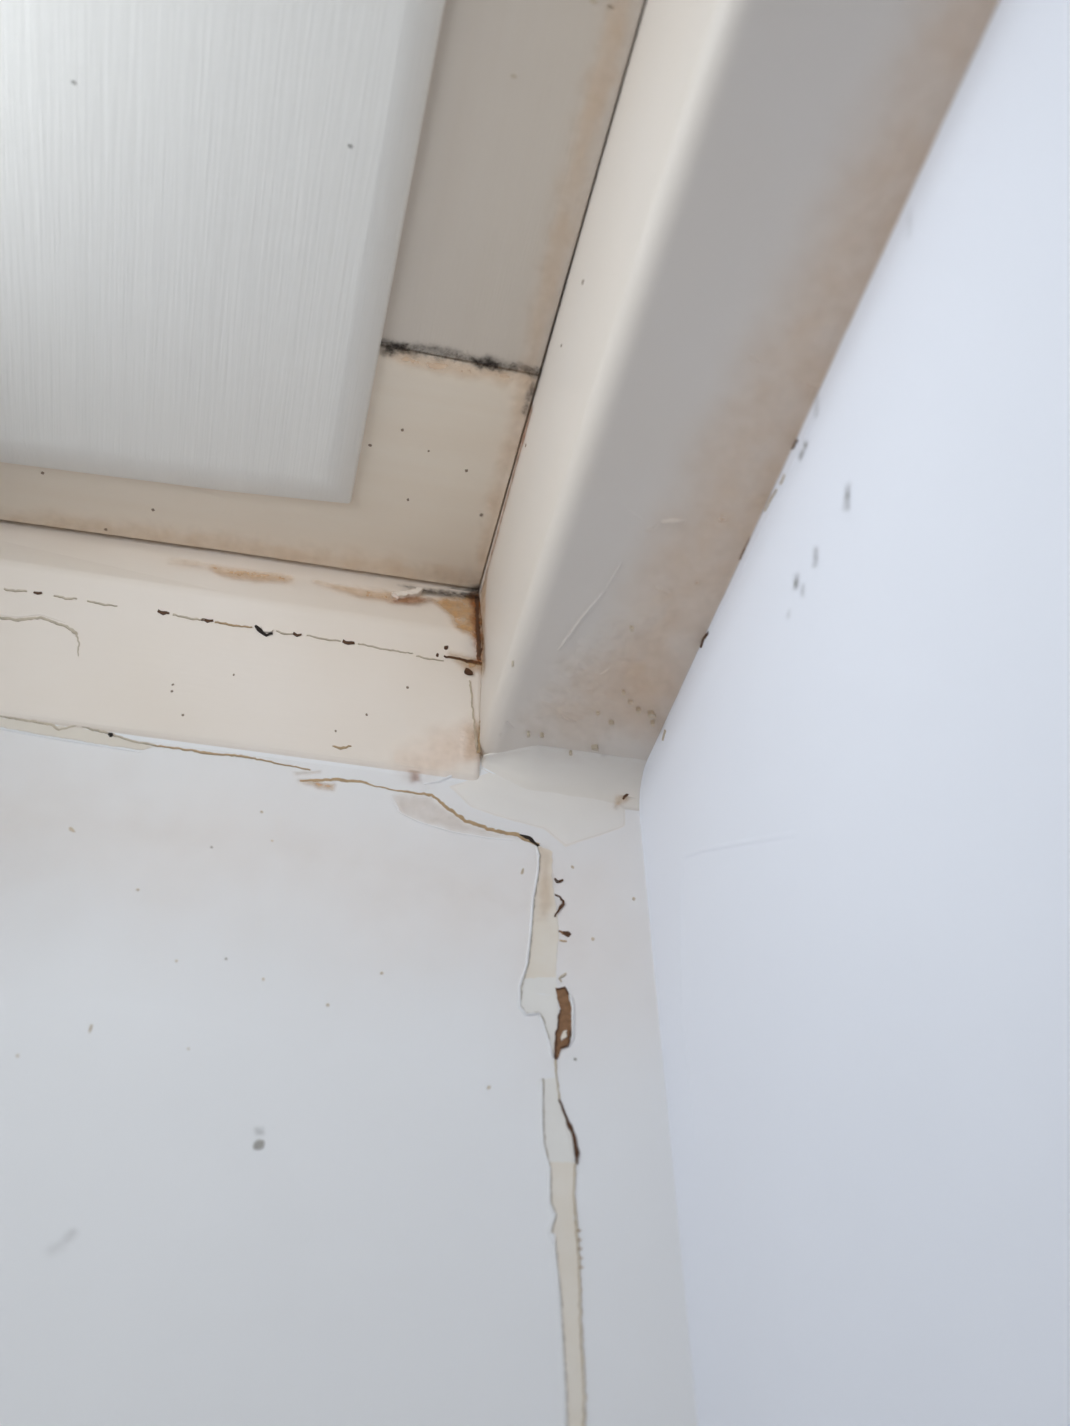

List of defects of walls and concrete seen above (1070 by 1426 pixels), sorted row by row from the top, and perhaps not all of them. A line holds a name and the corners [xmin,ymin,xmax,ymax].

leakage [434,348,528,371]
crack [0,588,117,656]
crack [157,609,481,753]
leakage [406,586,479,598]
crack [155,745,540,847]
peeling [518,846,574,1060]
peeling [540,1078,584,1426]
crack [554,1059,587,1426]